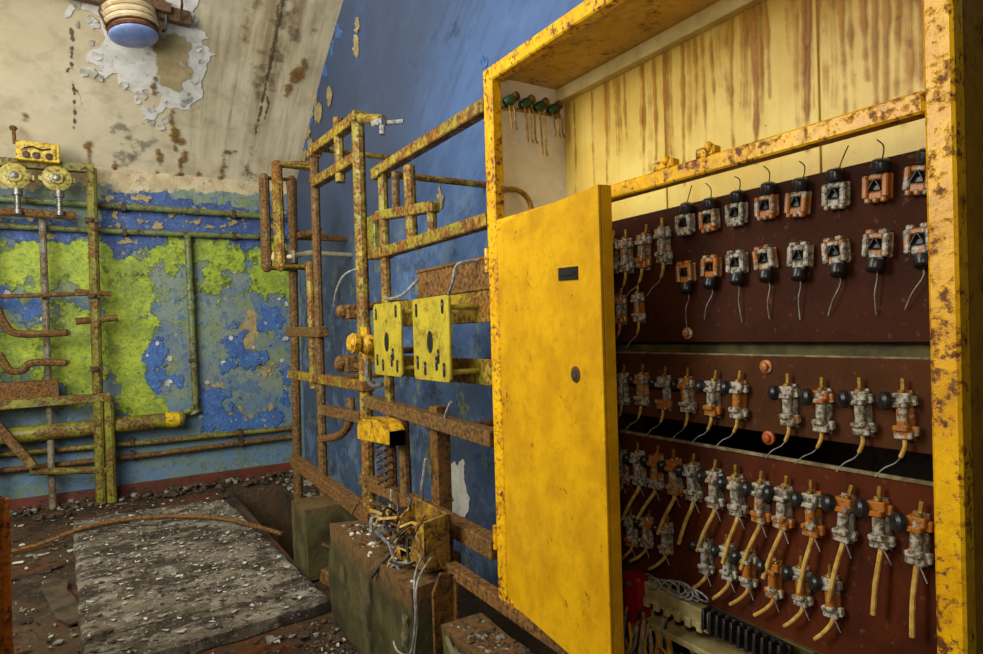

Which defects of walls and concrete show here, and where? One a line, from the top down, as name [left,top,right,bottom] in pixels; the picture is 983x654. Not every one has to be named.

peeling [64,0,216,130]
corrosion [169,110,187,176]
peeling [301,17,360,161]
peeling [0,189,299,439]
peeling [451,459,470,518]